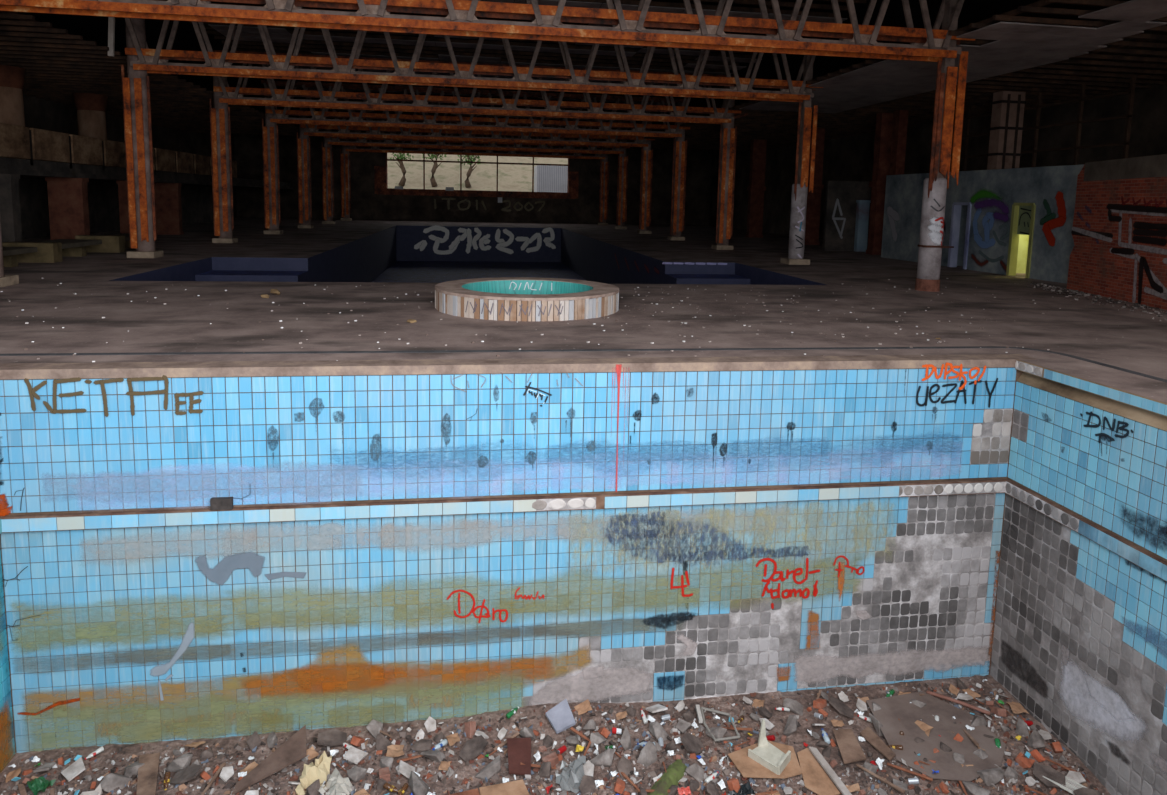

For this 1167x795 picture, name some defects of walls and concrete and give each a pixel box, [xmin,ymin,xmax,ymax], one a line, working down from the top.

water stain [16,508,887,669]
spalling [522,481,1167,795]
water stain [1123,509,1167,549]
rust [0,646,590,772]
water stain [26,666,649,752]